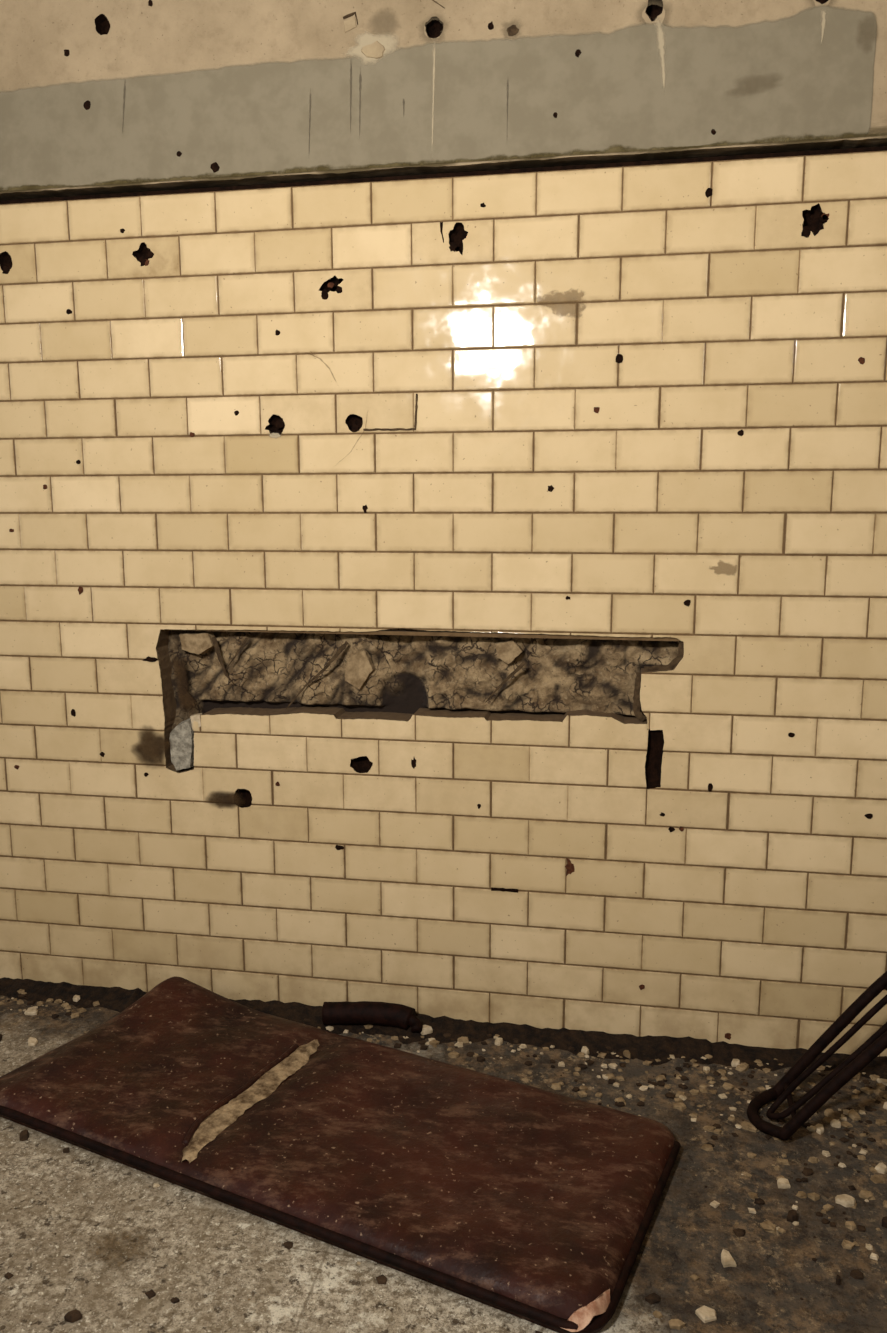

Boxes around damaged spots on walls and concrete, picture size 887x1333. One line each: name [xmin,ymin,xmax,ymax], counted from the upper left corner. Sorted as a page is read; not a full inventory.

crack [343,12,358,33]
flaking render [347,33,397,64]
spalling [143,628,683,773]